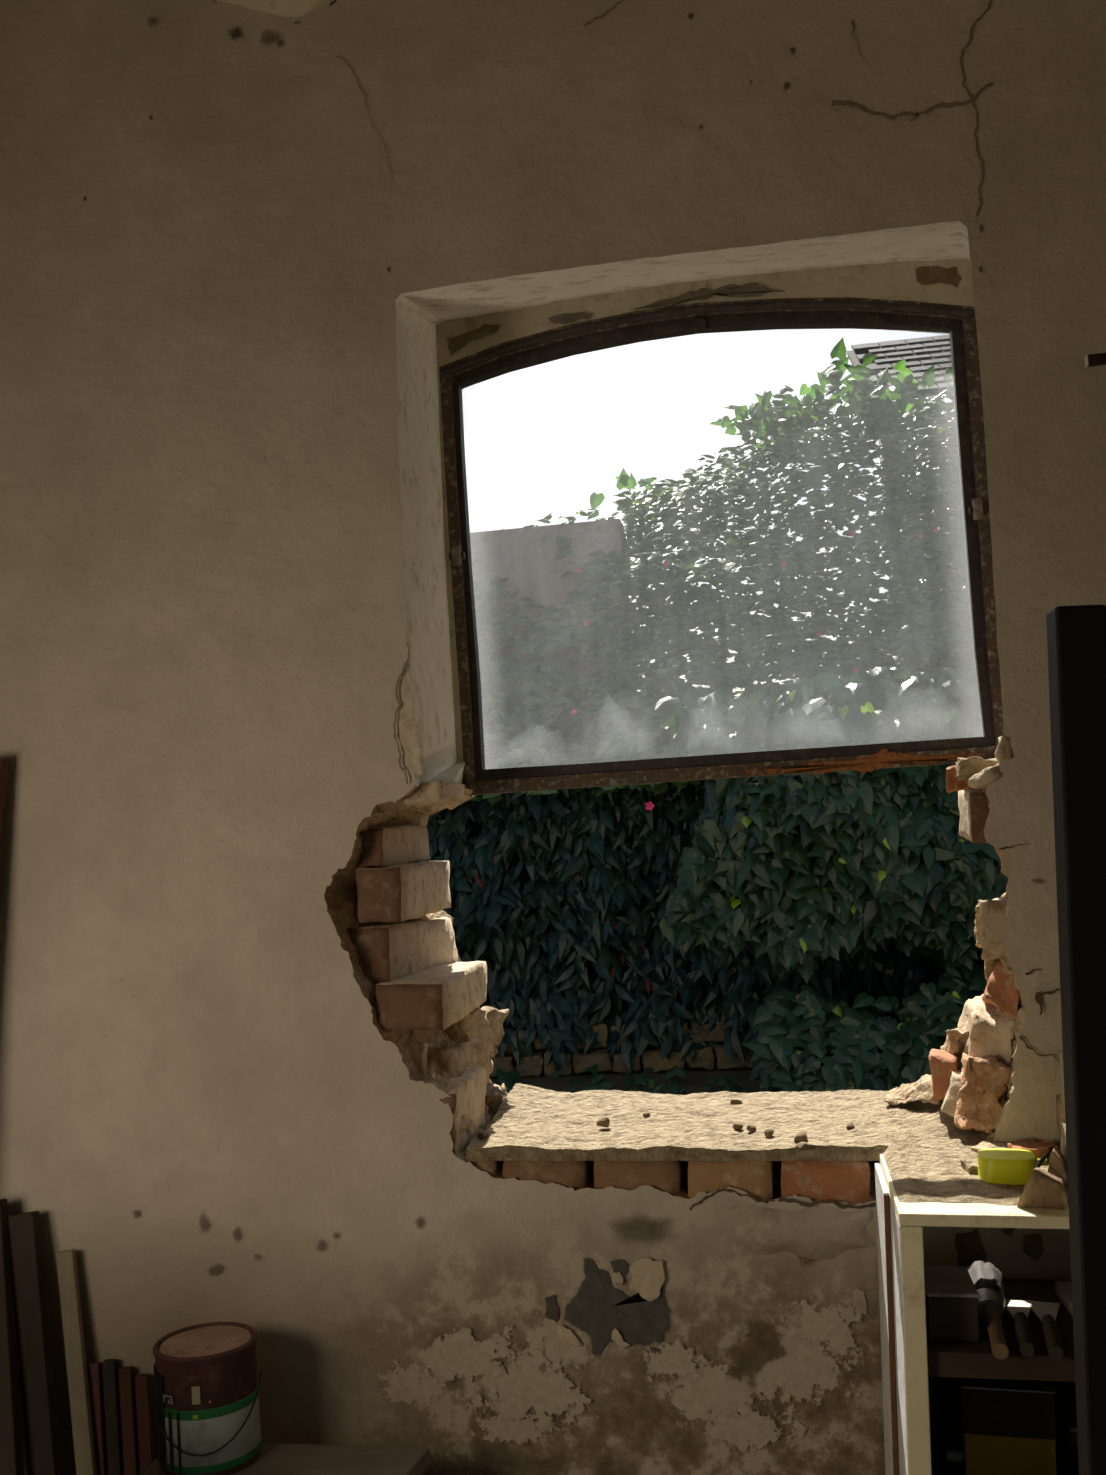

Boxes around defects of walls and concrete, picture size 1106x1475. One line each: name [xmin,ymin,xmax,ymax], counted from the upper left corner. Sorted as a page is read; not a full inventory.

crack [832,0,993,217]
peeling [916,266,962,287]
spalling [348,644,1068,1209]
water stain [376,1314,609,1475]
peeling [545,1257,670,1356]
water stain [618,1219,662,1240]
water stain [634,1288,872,1475]